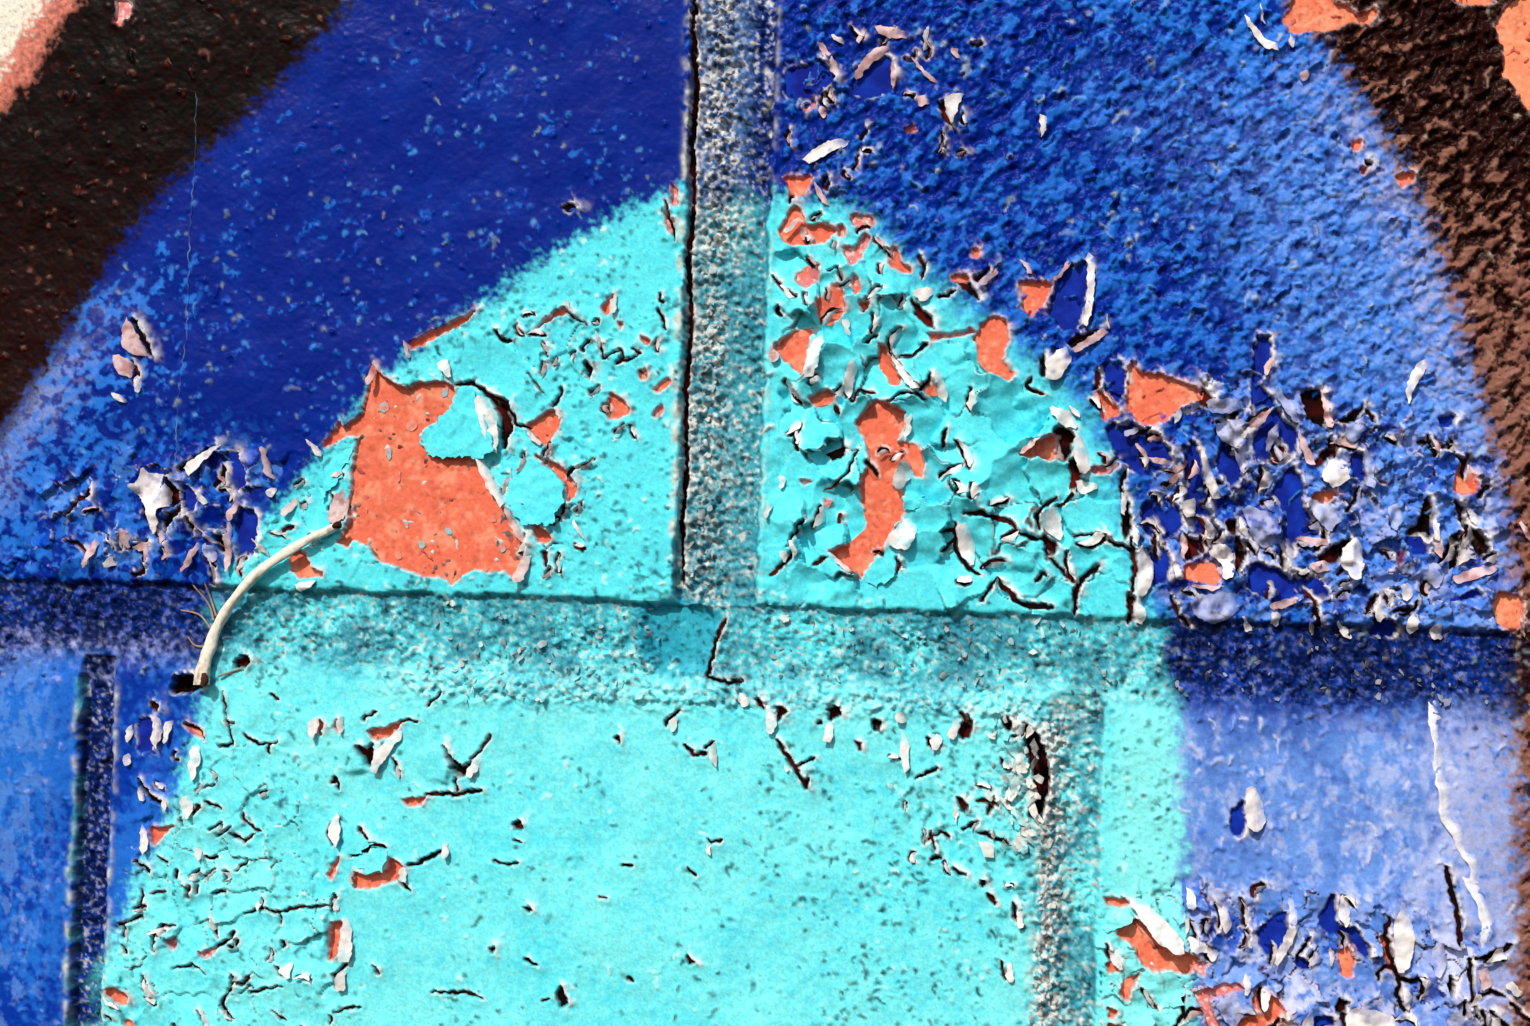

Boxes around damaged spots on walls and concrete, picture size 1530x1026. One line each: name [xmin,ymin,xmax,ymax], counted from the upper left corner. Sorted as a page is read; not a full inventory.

peeling [785,25,968,157]
peeling [1244,0,1375,51]
peeling [1454,0,1530,110]
peeling [111,317,152,403]
peeling [495,294,670,438]
peeling [764,130,1525,707]
peeling [65,359,661,703]
peeling [123,701,205,873]
peeling [327,812,449,992]
crack [665,710,718,767]
crack [707,619,815,789]
spalling [873,712,1062,1026]